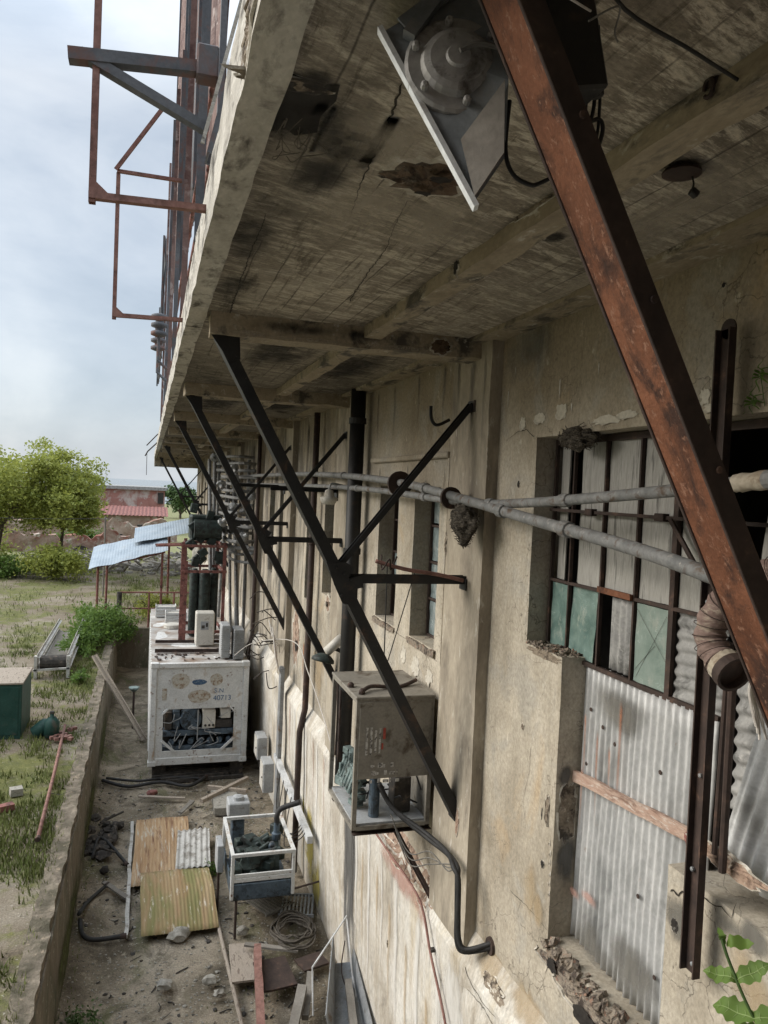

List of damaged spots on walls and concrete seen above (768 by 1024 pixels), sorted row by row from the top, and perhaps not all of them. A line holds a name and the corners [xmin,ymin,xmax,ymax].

crack [349,84,402,218]
leakage [296,163,342,192]
spalling [377,155,463,198]
crack [350,201,408,301]
peeling [519,404,567,431]
peeling [592,409,638,425]
leakage [560,767,571,785]
leakage [558,840,574,879]
flaking render [534,945,609,1024]